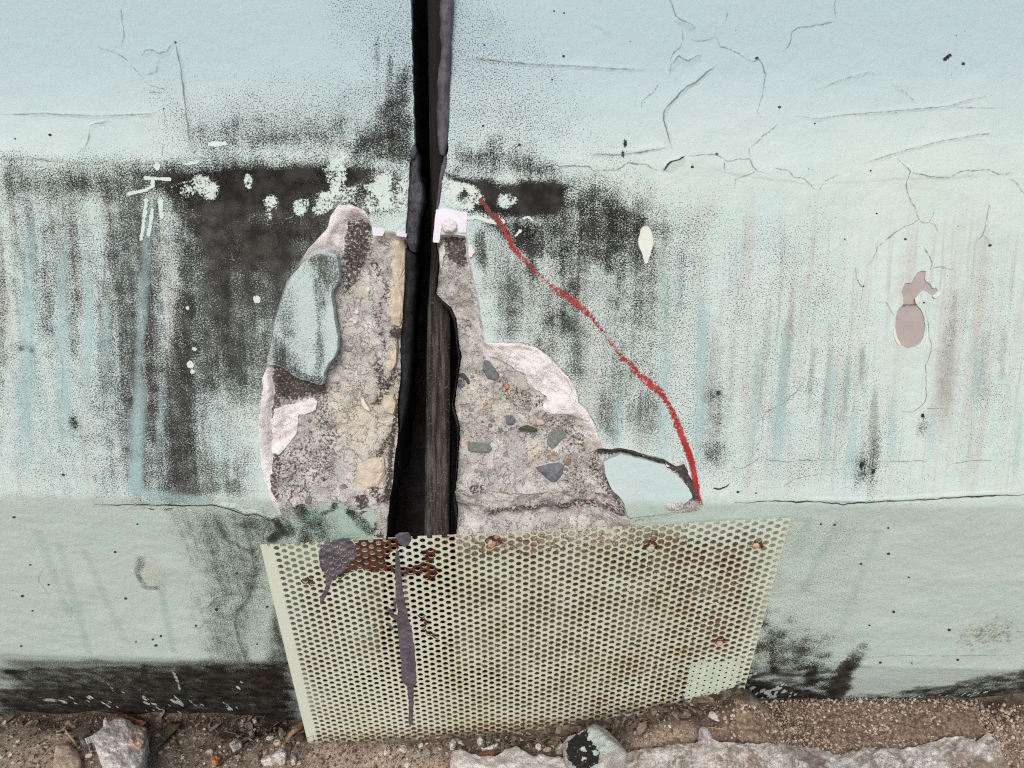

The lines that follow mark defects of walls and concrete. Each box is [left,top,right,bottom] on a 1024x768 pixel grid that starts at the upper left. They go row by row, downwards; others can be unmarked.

crack [467,2,838,189]
leakage [0,38,414,720]
spalling [258,204,407,550]
leakage [444,134,692,446]
spalling [436,234,704,554]
peeling [638,225,653,263]
crack [496,342,1024,505]
peeling [893,271,941,348]
crack [906,311,941,412]
crack [855,138,1023,313]
rust [336,538,438,585]
leakage [738,609,1024,700]